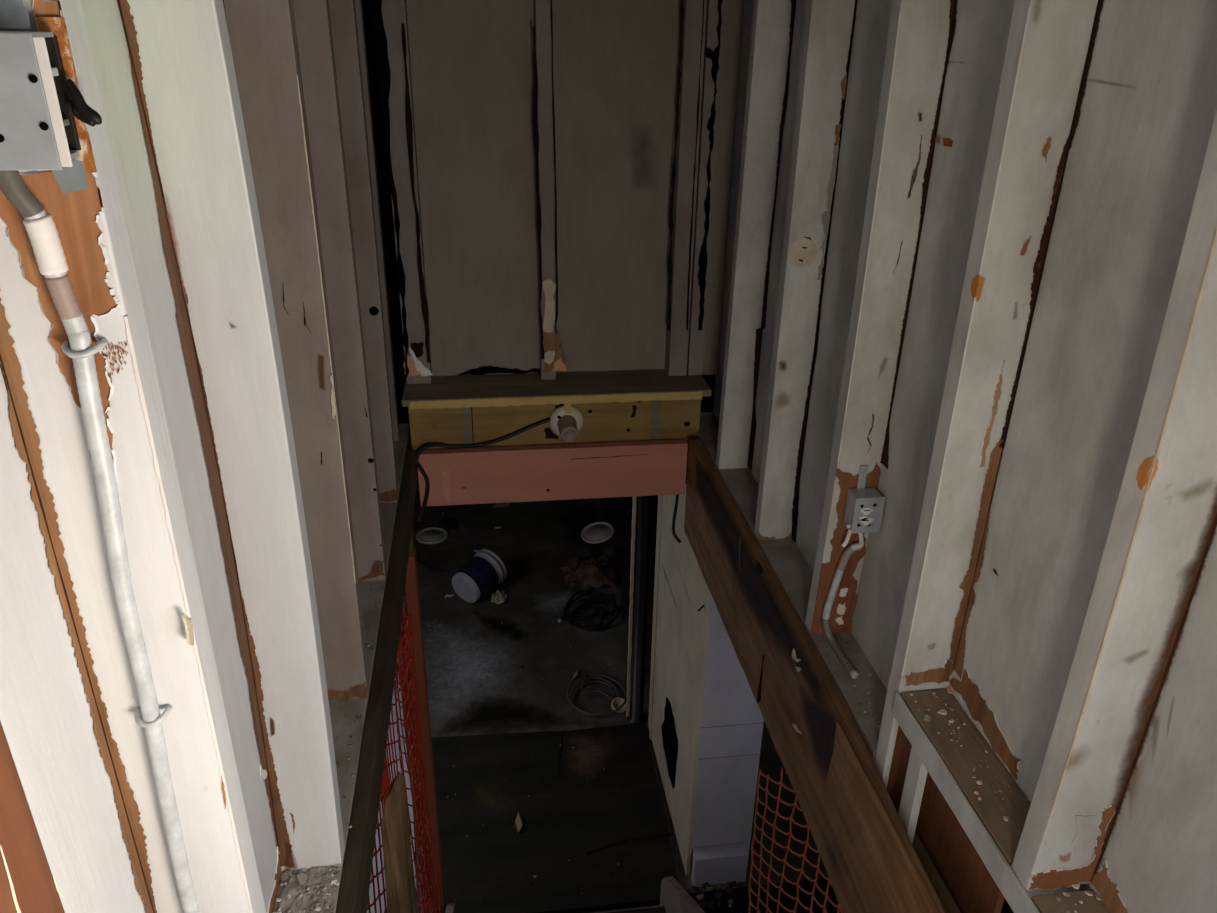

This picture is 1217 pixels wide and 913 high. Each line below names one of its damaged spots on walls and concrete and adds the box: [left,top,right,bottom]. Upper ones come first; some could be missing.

peeling [0,189,81,408]
peeling [19,170,128,483]
peeling [542,331,566,373]
peeling [971,273,985,303]
crack [949,0,1104,679]
peeling [978,360,1005,468]
peeling [1136,456,1158,491]
peeling [810,461,881,636]
peeling [182,615,194,645]
peeling [904,659,1021,781]
peeling [1027,804,1128,913]